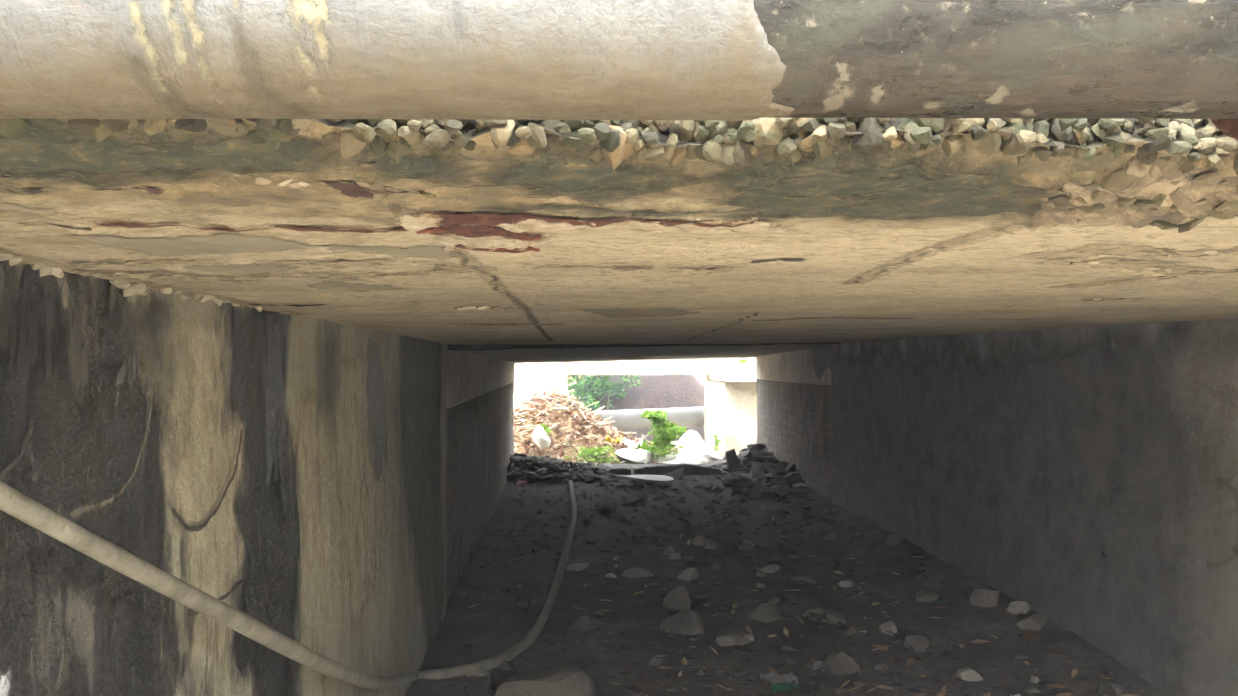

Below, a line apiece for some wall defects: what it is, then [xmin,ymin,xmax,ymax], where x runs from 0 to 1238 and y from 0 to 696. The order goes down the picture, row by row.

spalling [0,118,308,142]
spalling [322,62,1238,233]
water stain [67,234,455,274]
crack [450,250,552,341]
spalling [256,177,794,253]
crack [845,219,1023,285]
water stain [0,260,443,654]
water stain [0,510,326,696]